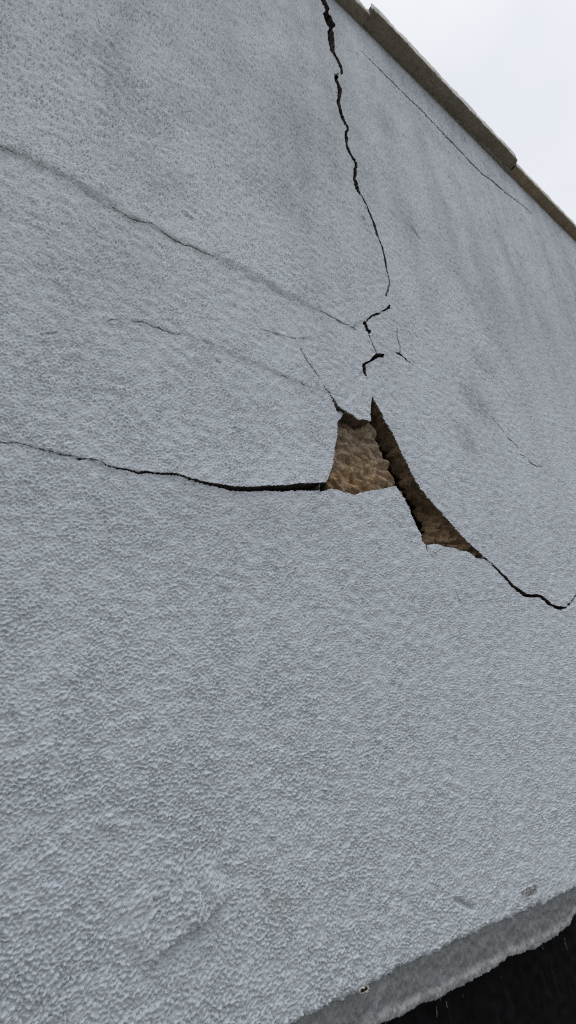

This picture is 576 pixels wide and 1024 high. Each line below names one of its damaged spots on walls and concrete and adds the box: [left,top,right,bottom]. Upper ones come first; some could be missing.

crack [317,0,530,376]
crack [110,205,213,256]
crack [0,441,327,492]
spalling [304,395,484,559]
crack [476,556,576,610]